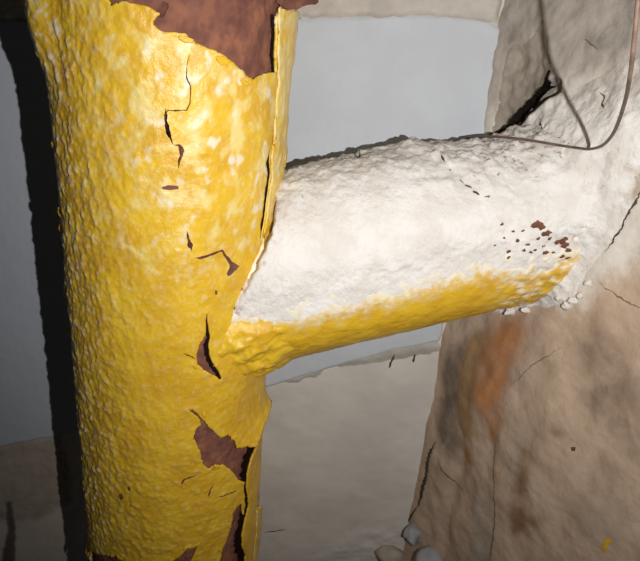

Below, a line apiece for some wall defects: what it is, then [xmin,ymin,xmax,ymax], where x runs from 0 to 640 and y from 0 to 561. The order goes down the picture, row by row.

crack [164,58,191,169]
peeling [110,0,318,245]
crack [490,70,557,135]
crack [260,151,270,239]
crack [187,232,240,276]
peeling [184,315,221,379]
peeling [190,410,247,480]
crack [408,443,462,522]
peeling [218,505,241,561]